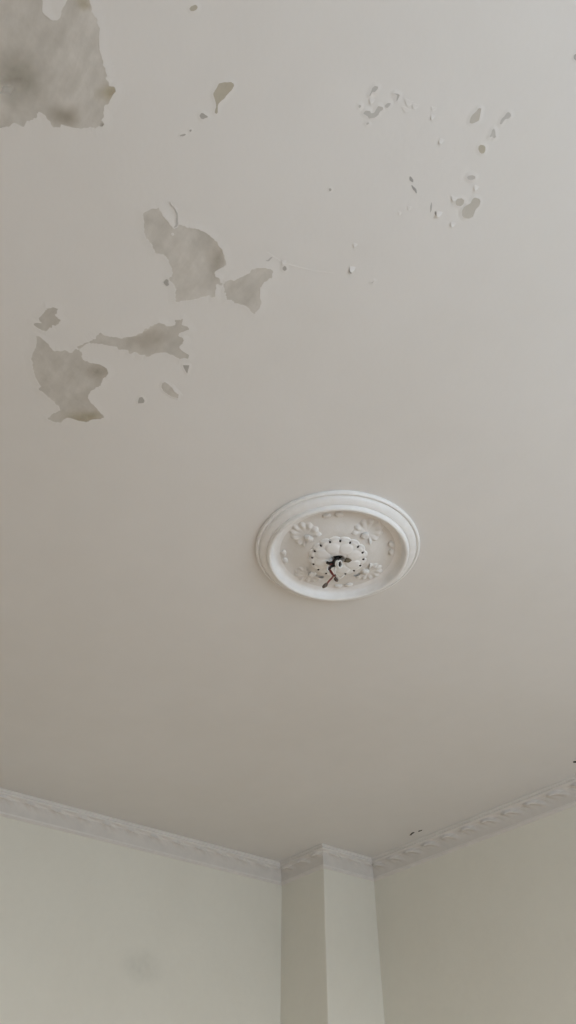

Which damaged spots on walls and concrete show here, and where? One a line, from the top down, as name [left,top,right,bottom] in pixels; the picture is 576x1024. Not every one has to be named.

peeling [0,0,125,139]
peeling [196,77,238,123]
peeling [452,194,484,222]
peeling [24,200,290,428]